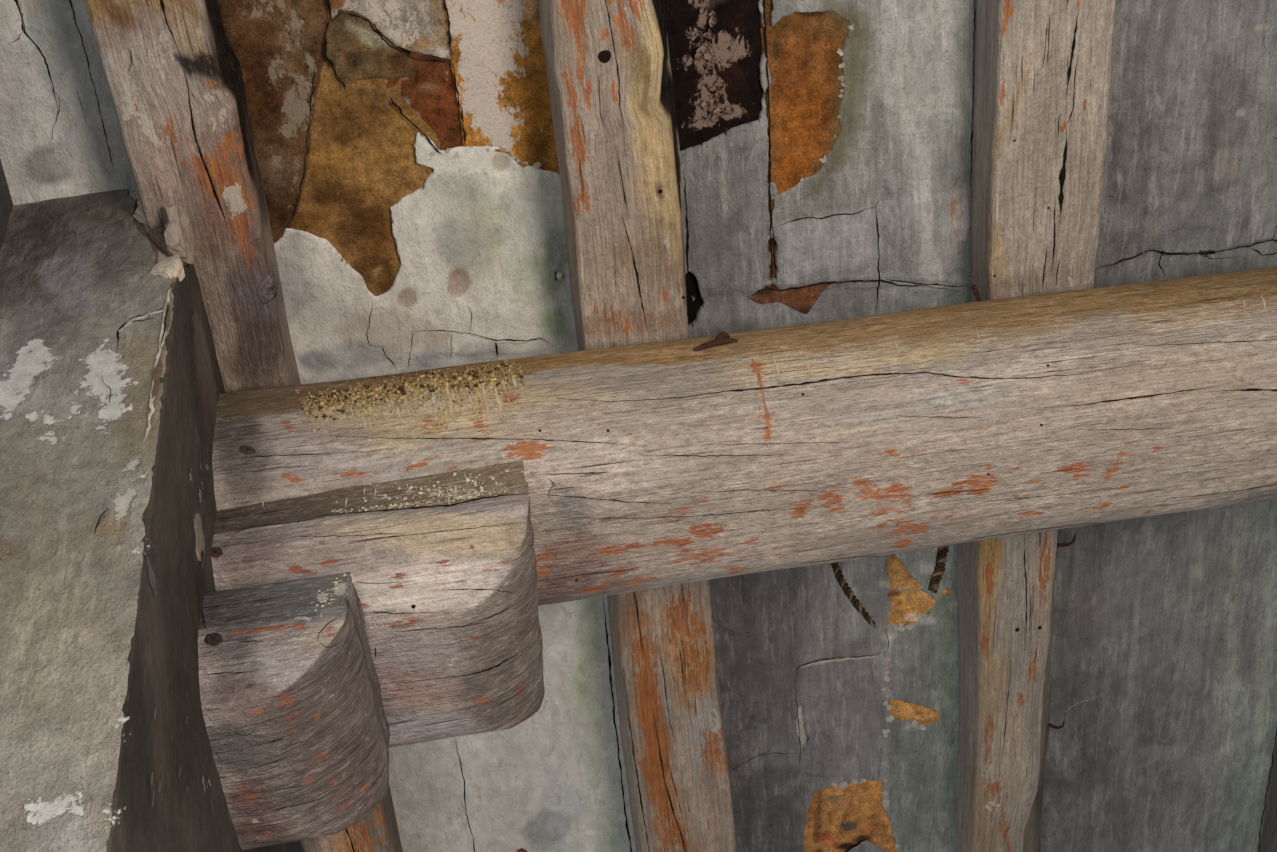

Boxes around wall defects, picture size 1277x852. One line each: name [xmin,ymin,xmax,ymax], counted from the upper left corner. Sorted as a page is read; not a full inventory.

crack [10,0,120,186]
peeling [217,0,560,296]
peeling [760,11,855,195]
crack [769,200,961,308]
crack [1096,226,1277,276]
spalling [0,195,194,448]
peeling [886,554,951,631]
peeling [885,699,940,731]
peeling [804,778,900,852]